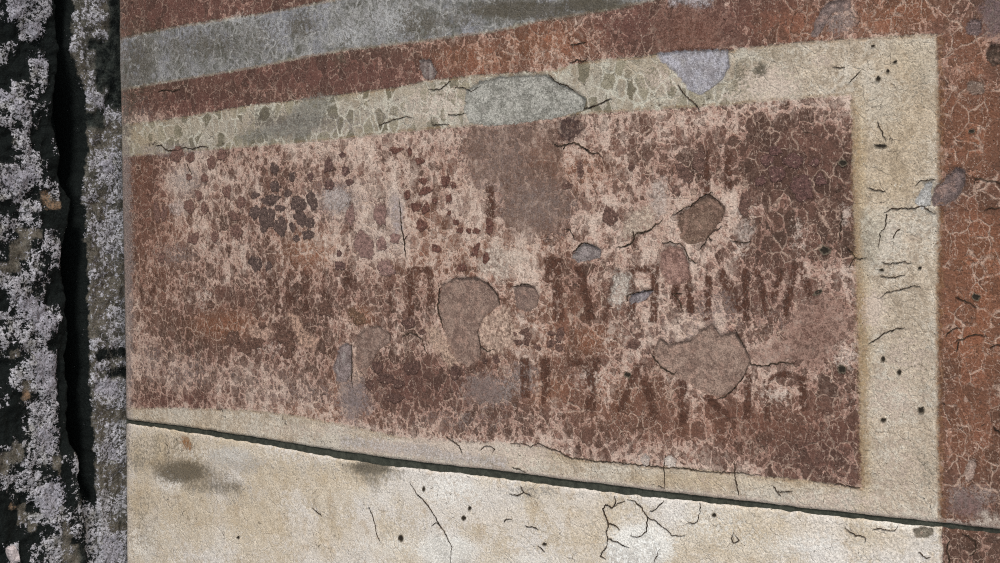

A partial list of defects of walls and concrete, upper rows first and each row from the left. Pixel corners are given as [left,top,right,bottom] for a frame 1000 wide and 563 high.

peeling [464,75,586,126]
flaking render [657,49,730,95]
peeling [389,147,425,165]
peeling [401,176,564,380]
crack [553,142,603,158]
peeling [602,148,706,238]
peeling [660,195,725,285]
peeling [737,190,754,240]
crack [839,179,933,294]
peeling [333,307,421,404]
crack [410,483,452,563]
crack [447,437,791,562]